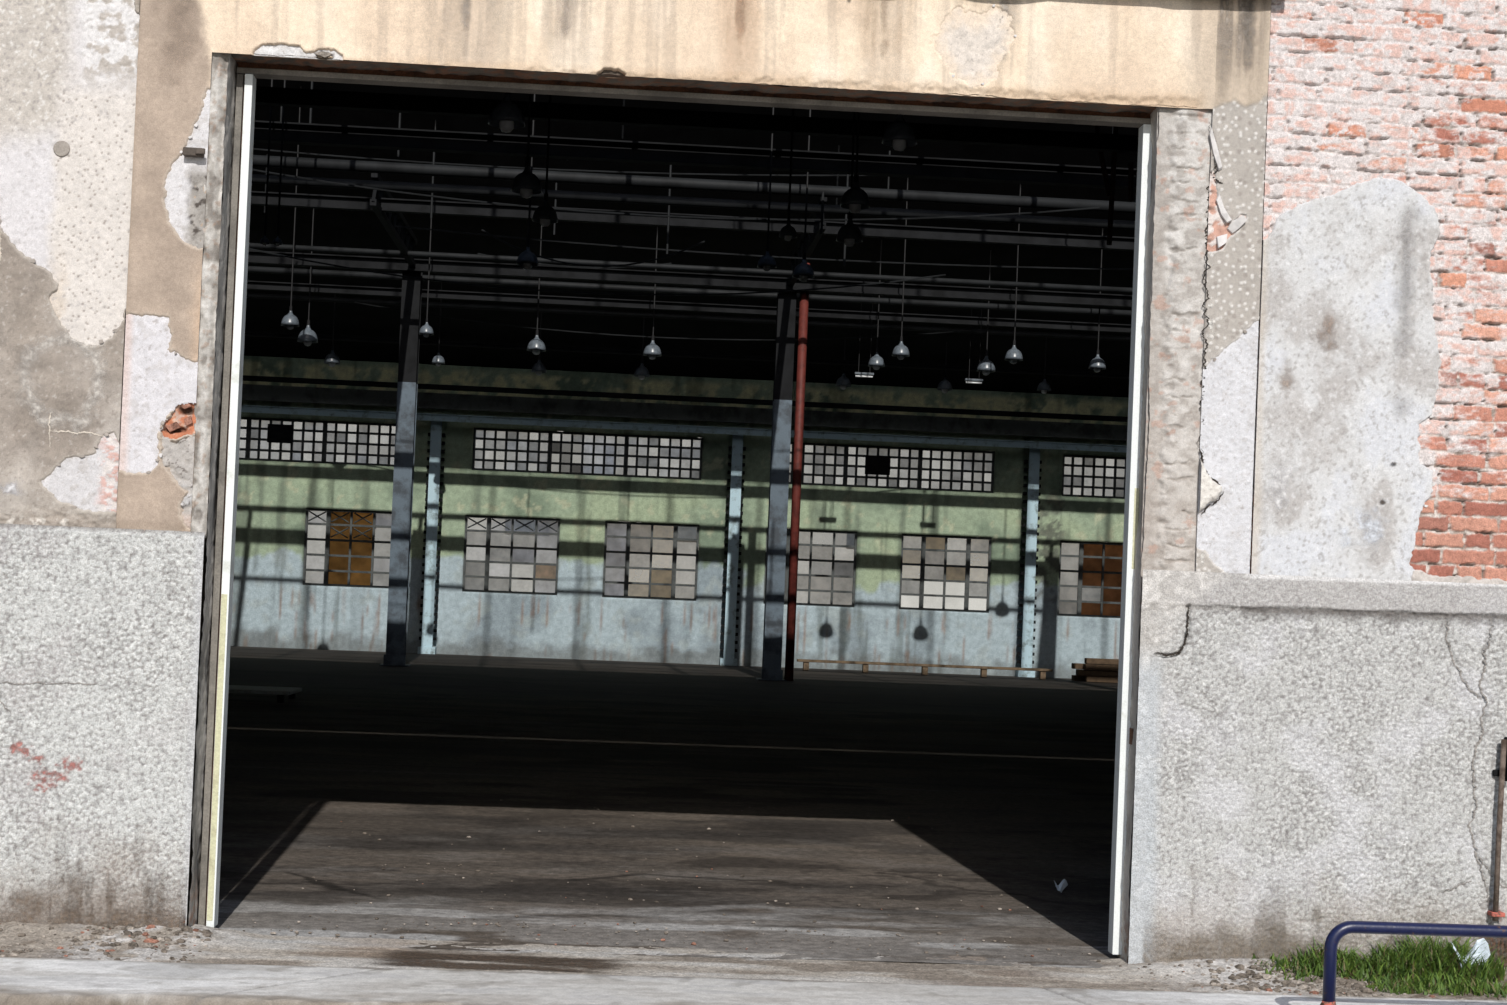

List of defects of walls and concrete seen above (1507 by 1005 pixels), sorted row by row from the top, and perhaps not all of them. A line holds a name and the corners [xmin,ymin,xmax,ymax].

flaking render [0,0,198,529]
flaking render [164,89,211,249]
flaking render [1207,127,1247,253]
flaking render [1196,176,1507,585]
crack [0,681,99,712]
crack [1156,606,1189,657]
crack [1441,619,1507,911]